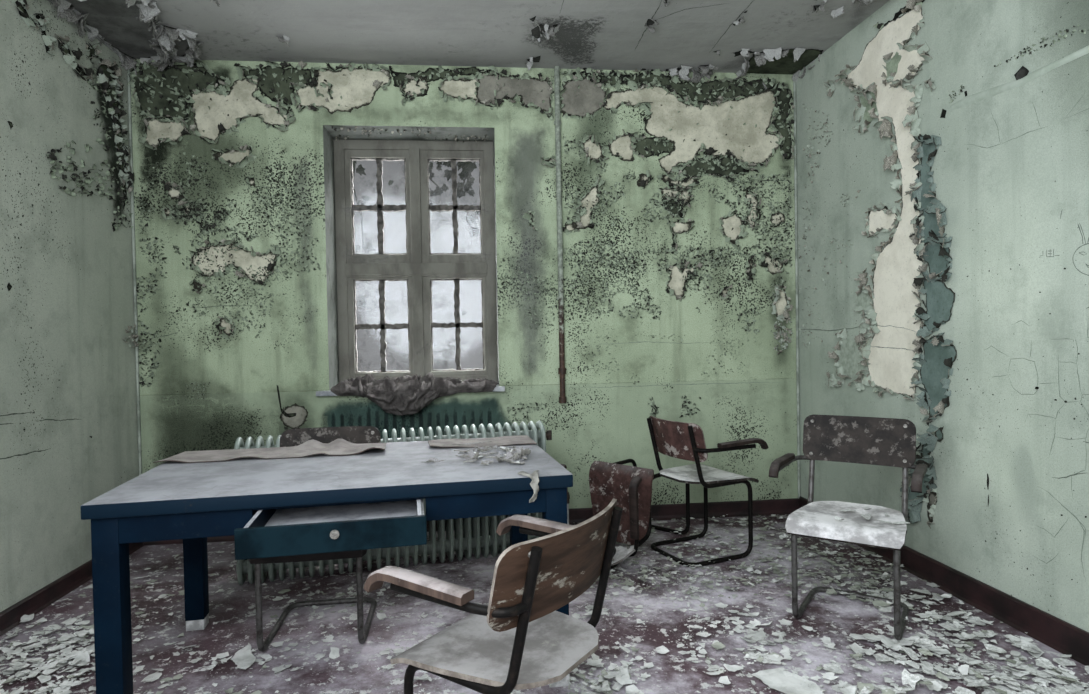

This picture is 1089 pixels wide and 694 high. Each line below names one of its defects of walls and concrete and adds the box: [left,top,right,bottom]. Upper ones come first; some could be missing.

peeling [811,0,874,18]
peeling [214,316,236,340]
peeling [9,0,823,301]
water stain [513,137,542,367]
peeling [745,252,793,322]
peeling [824,0,957,529]
crack [985,329,1089,582]